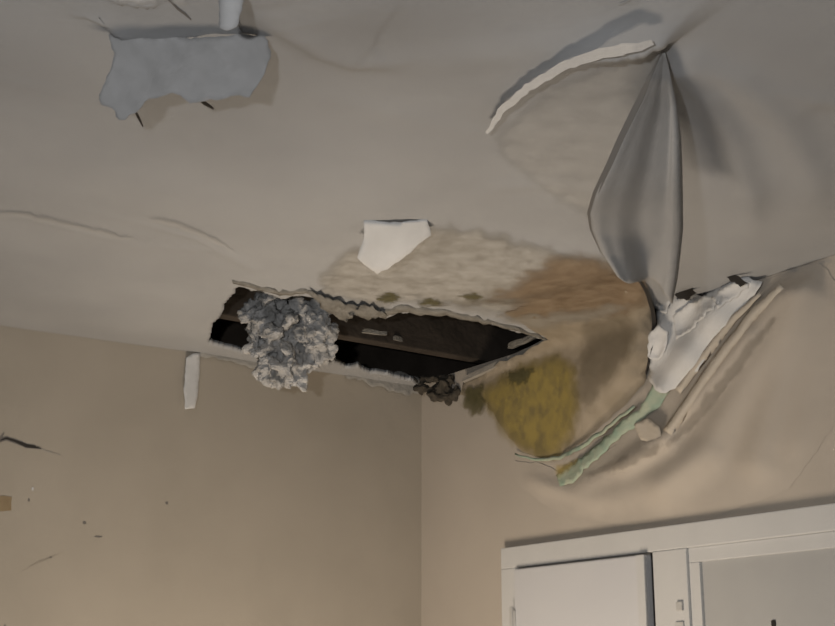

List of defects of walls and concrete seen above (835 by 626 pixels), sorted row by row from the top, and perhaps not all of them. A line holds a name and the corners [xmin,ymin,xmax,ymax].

peeling [99,30,271,127]
flaking render [501,60,656,209]
spalling [232,219,559,341]
crack [0,433,59,455]
peeling [183,353,258,409]
leakage [463,356,577,458]